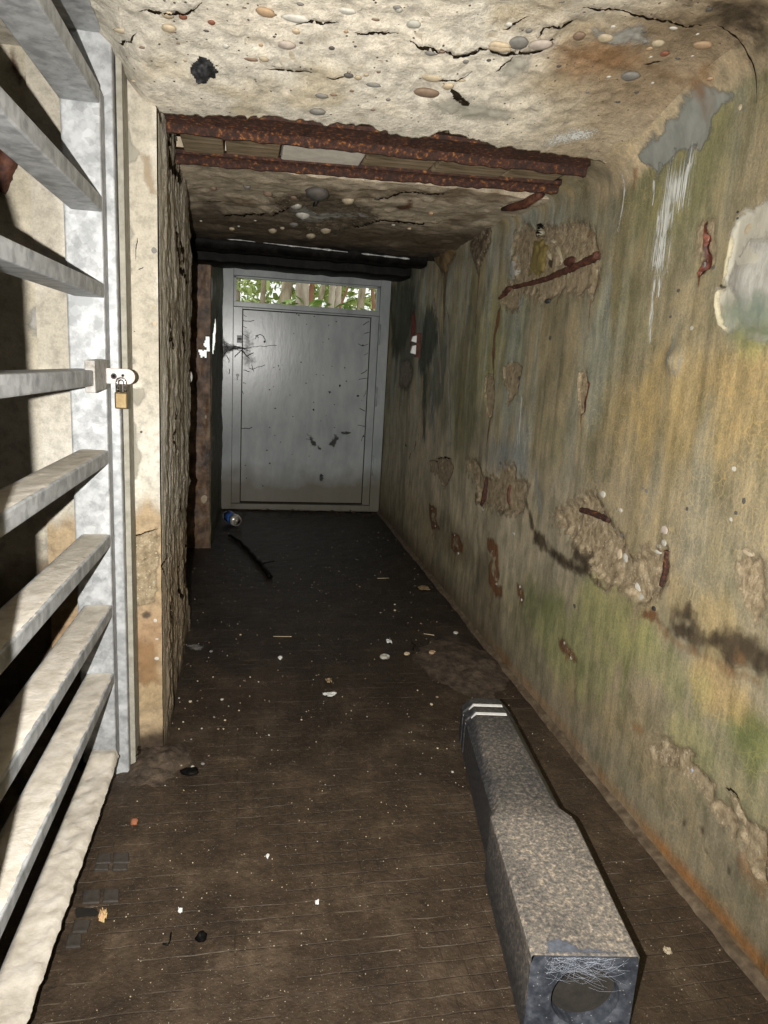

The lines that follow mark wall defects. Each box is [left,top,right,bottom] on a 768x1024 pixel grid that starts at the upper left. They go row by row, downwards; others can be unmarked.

crack [296,7,757,104]
crack [355,191,444,228]
spalling [498,220,601,314]
leakage [649,145,696,341]
peeling [696,198,768,341]
spalling [576,371,590,424]
spalling [430,456,529,517]
corrosion [487,538,502,597]
leakage [526,500,601,585]
spalling [549,489,670,620]
leakage [673,603,768,673]
spalling [645,735,768,884]